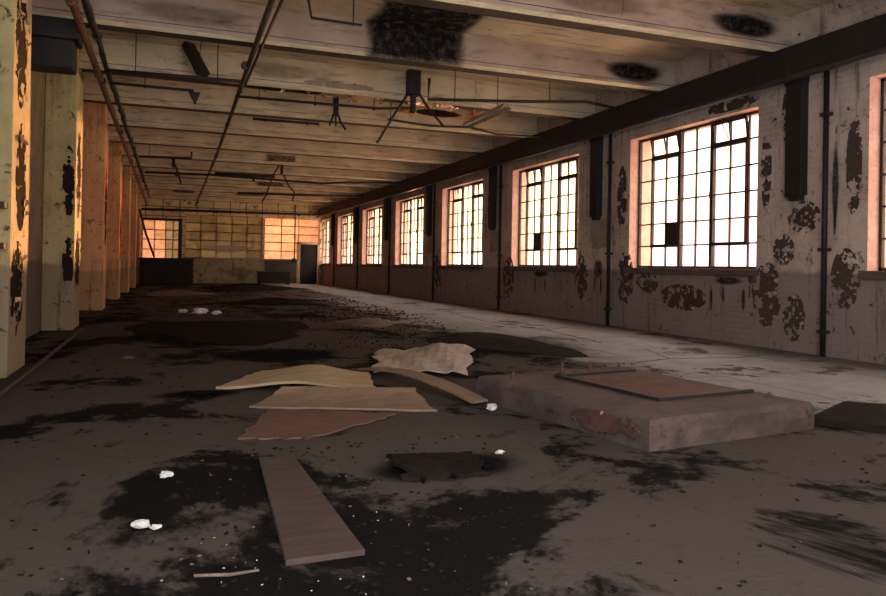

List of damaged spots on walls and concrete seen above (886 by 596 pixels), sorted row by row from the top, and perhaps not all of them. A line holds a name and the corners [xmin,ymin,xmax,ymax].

peeling [752,201,820,341]